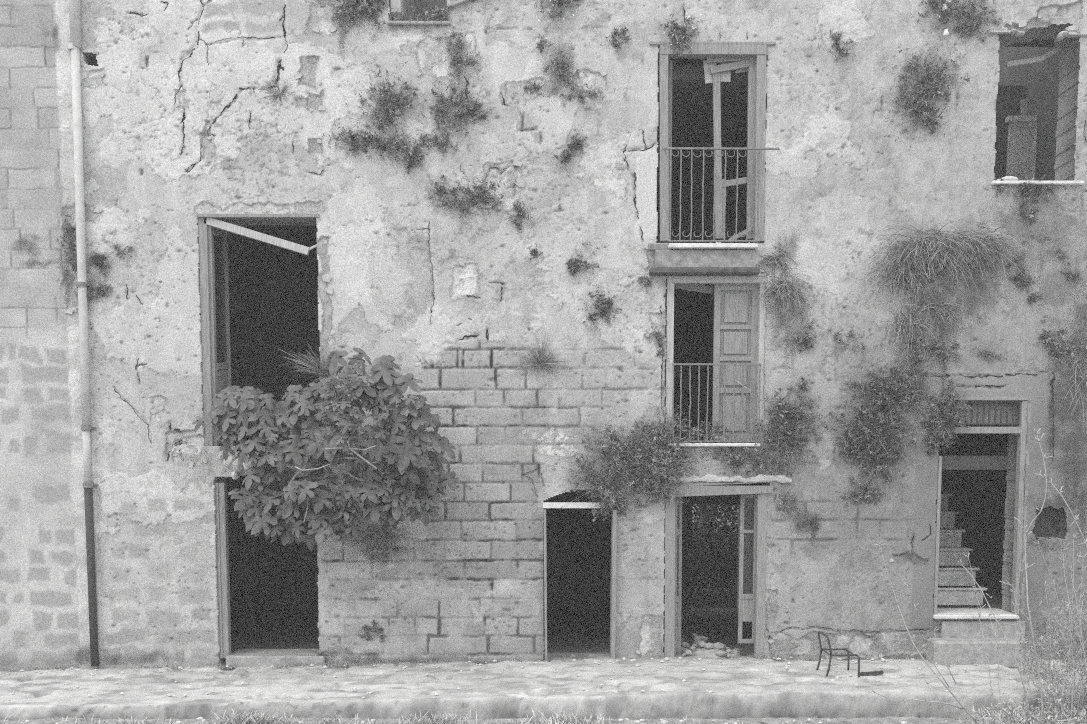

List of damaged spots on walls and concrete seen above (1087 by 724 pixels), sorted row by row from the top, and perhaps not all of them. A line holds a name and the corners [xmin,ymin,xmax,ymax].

crack [174,0,288,172]
peeling [523,430,579,457]
spalling [636,615,659,657]